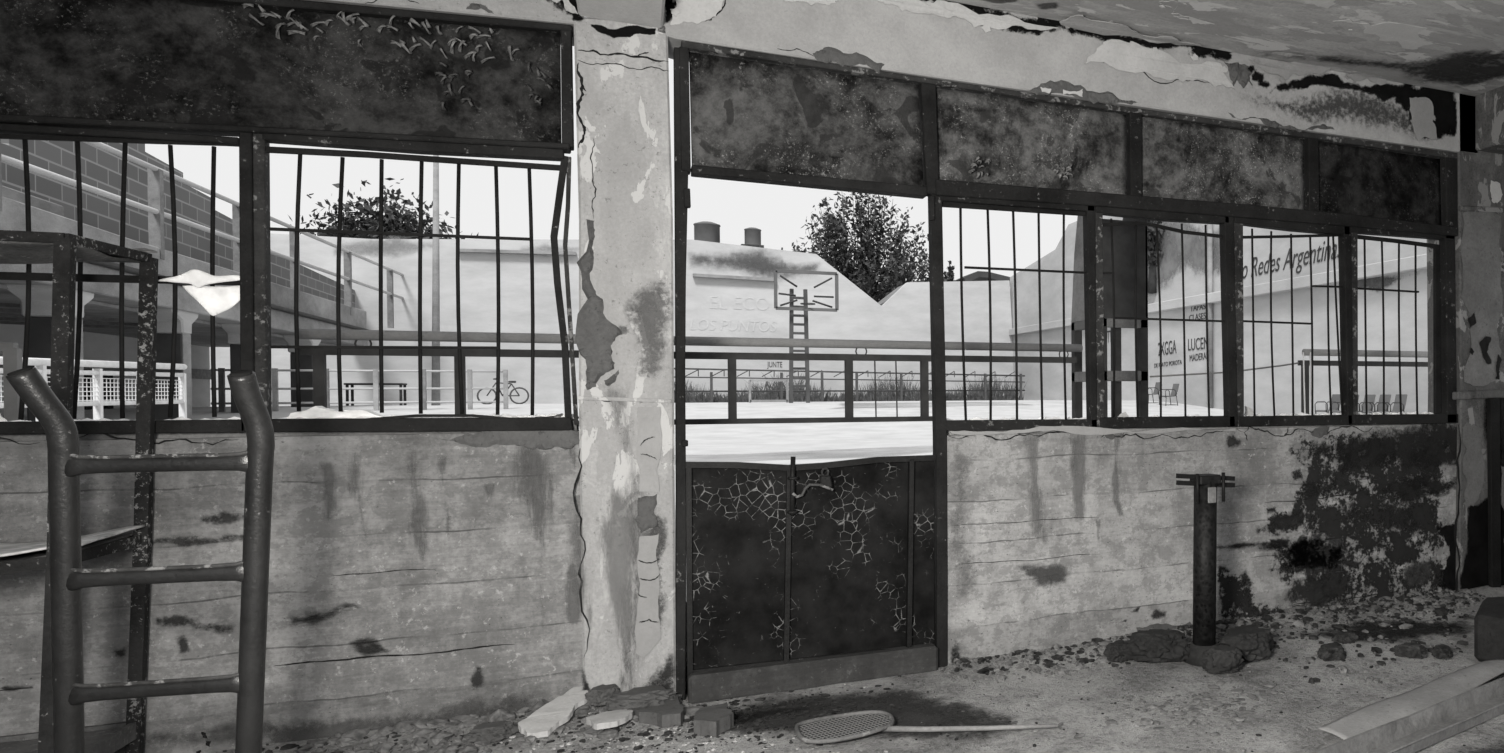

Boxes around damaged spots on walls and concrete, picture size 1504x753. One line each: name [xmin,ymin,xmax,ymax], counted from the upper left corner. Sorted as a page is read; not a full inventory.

peeling [552,0,578,14]
peeling [670,0,724,25]
spalling [813,47,885,72]
peeling [878,0,1234,88]
spalling [1029,80,1138,105]
peeling [1249,58,1387,86]
peeling [1410,97,1437,141]
spalling [575,219,622,390]
peeling [1460,180,1504,386]
peeling [1462,422,1504,509]
spalling [635,494,659,533]
water stain [1217,423,1457,619]